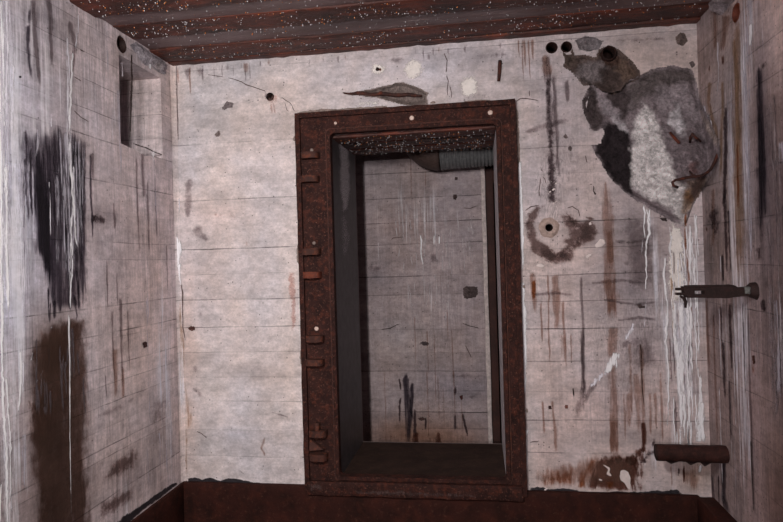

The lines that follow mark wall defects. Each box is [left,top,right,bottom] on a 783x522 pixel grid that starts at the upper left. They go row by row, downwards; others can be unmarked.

water stain [0,1,33,522]
water stain [19,14,104,416]
spalling [343,82,435,106]
water stain [525,205,595,261]
spalling [563,36,720,226]
water stain [642,206,651,289]
spalling [675,32,688,46]
water stain [663,214,705,445]
water stain [742,20,783,409]
rust [580,423,646,490]